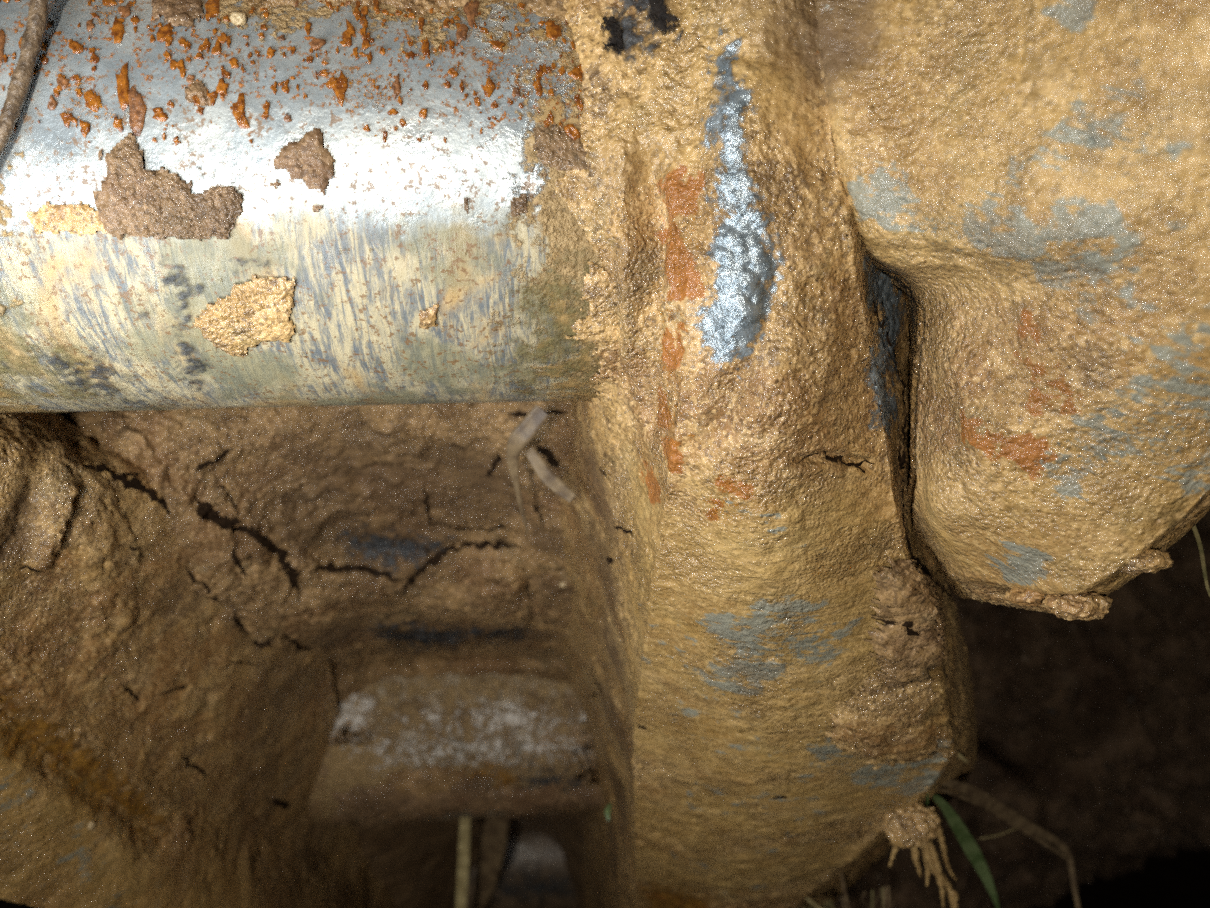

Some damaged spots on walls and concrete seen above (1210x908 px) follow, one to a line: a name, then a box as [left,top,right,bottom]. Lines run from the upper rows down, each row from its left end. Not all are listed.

corrosion [0,0,30,91]
corrosion [14,0,584,147]
peeling [601,0,683,62]
corrosion [650,166,717,495]
crack [505,409,569,417]
crack [536,445,559,468]
crack [798,301,955,602]
crack [84,449,535,623]
crack [185,566,312,671]
crack [871,617,938,636]
crack [123,684,189,703]
water stain [332,692,594,794]